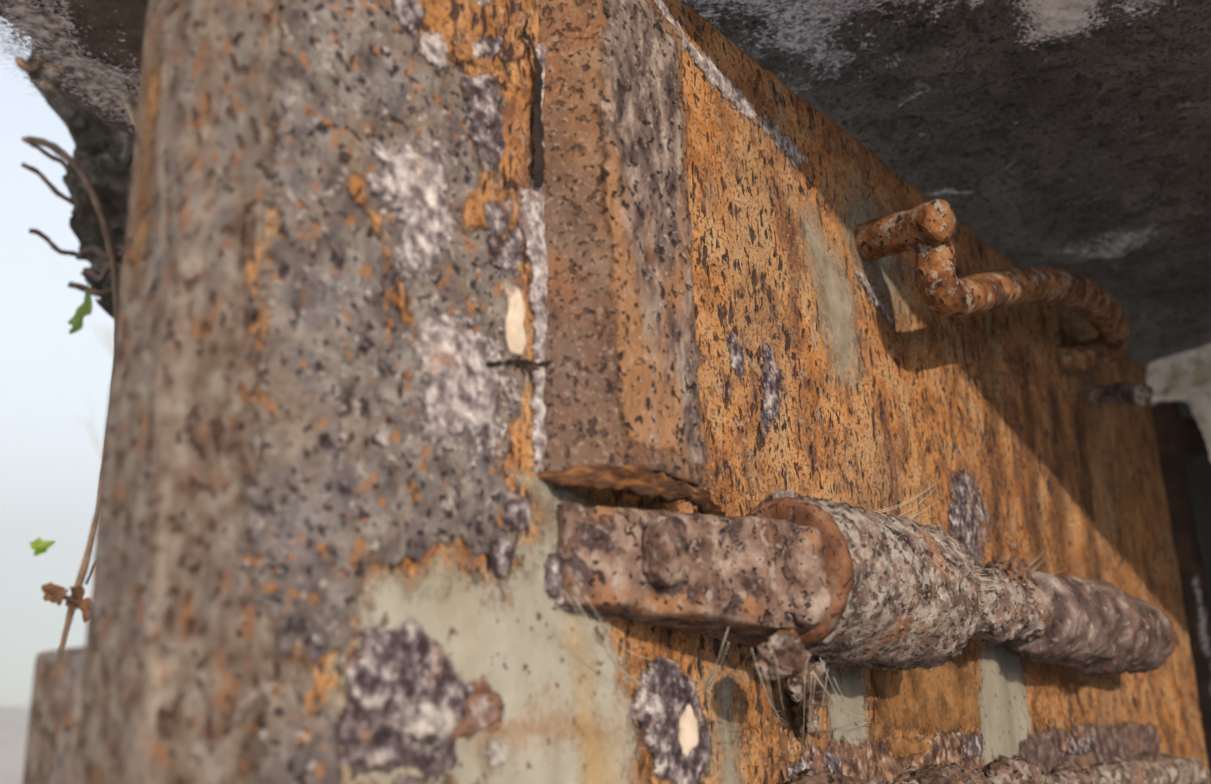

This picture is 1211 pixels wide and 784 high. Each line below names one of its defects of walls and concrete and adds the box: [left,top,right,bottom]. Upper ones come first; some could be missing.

corrosion [418,0,537,73]
leakage [680,0,960,98]
leakage [1008,0,1180,51]
corrosion [347,173,417,331]
corrosion [462,166,519,246]
leakage [1145,343,1211,406]
corrosion [625,654,677,784]
corrosion [731,648,783,784]
corrosion [866,647,982,744]
corrosion [1033,678,1098,732]